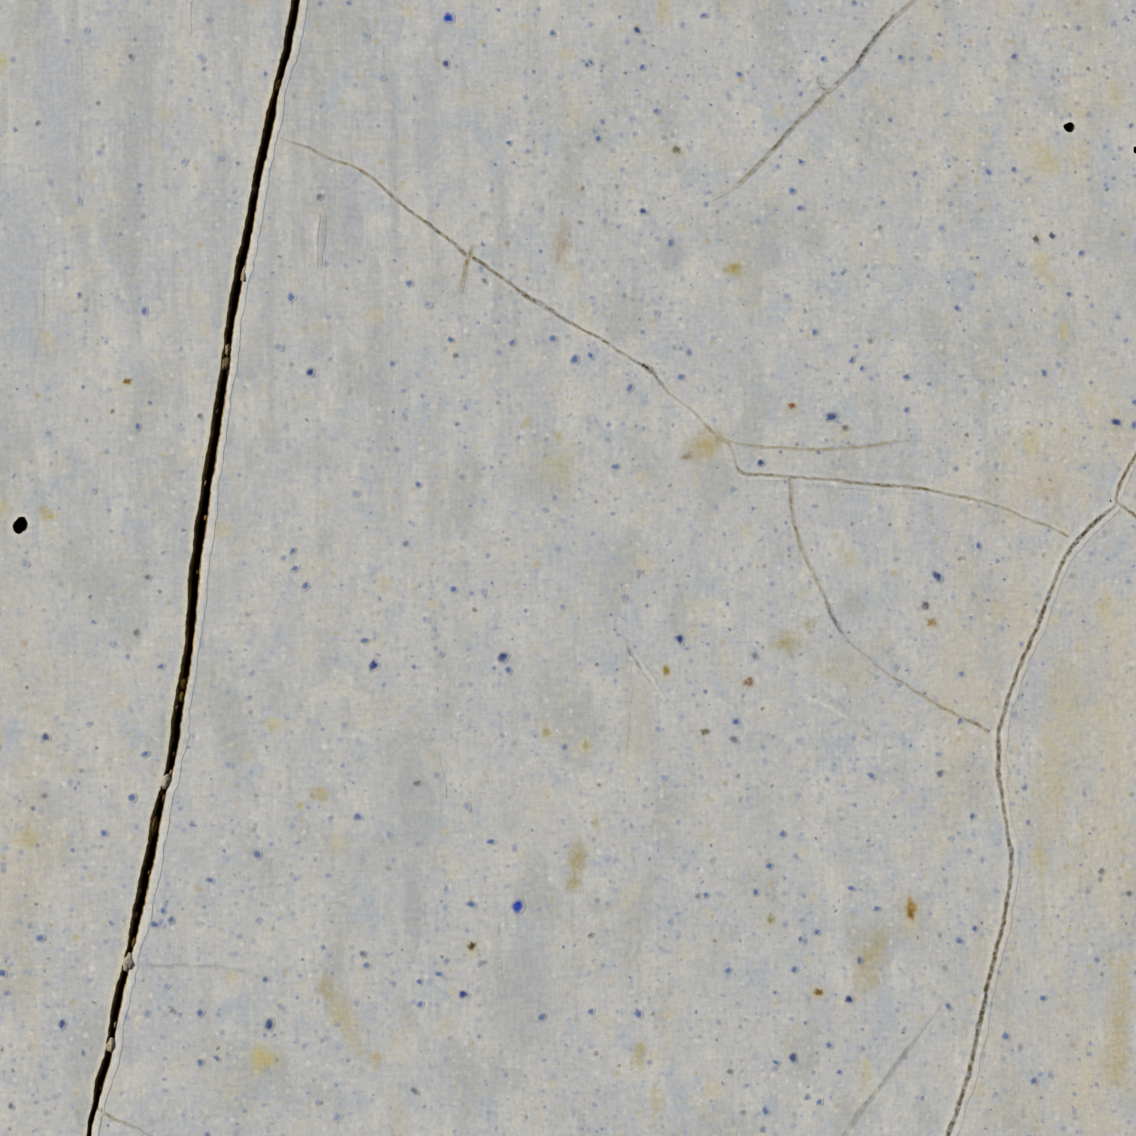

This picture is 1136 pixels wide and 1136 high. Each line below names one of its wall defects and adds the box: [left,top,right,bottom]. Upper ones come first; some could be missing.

crack [79,0,308,1136]
crack [278,134,1136,1136]
crack [709,0,916,202]